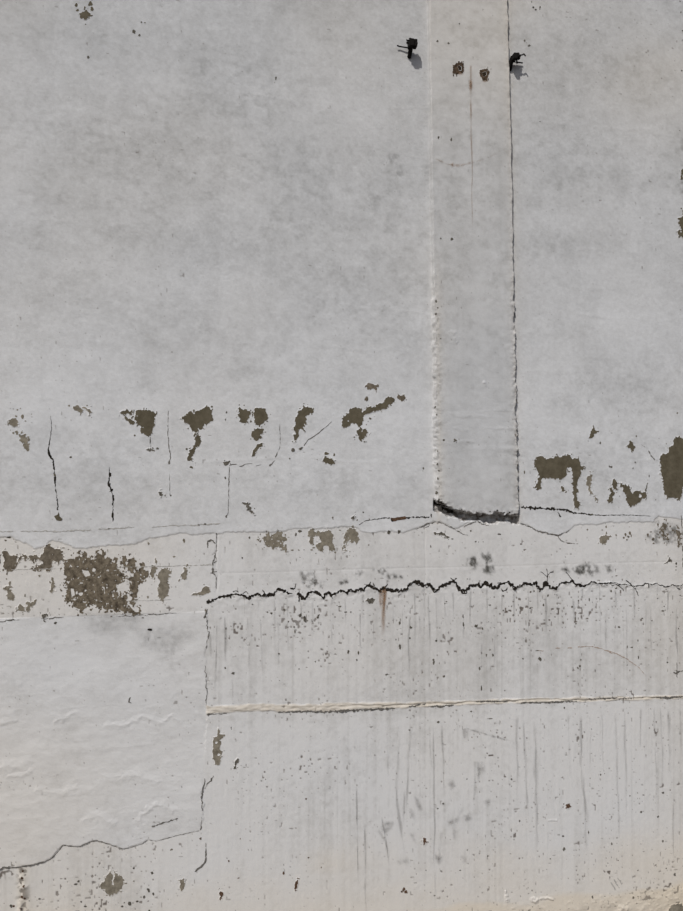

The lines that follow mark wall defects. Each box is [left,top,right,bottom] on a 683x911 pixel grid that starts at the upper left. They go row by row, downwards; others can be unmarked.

peeling [119,406,159,452]
peeling [179,405,214,468]
peeling [225,404,271,457]
peeling [291,403,314,443]
peeling [341,382,407,442]
peeling [517,435,683,512]
peeling [249,512,374,554]
peeling [0,536,190,624]
crack [1,416,683,716]
peeling [212,727,232,766]
crack [0,777,213,872]
peeling [99,868,154,907]